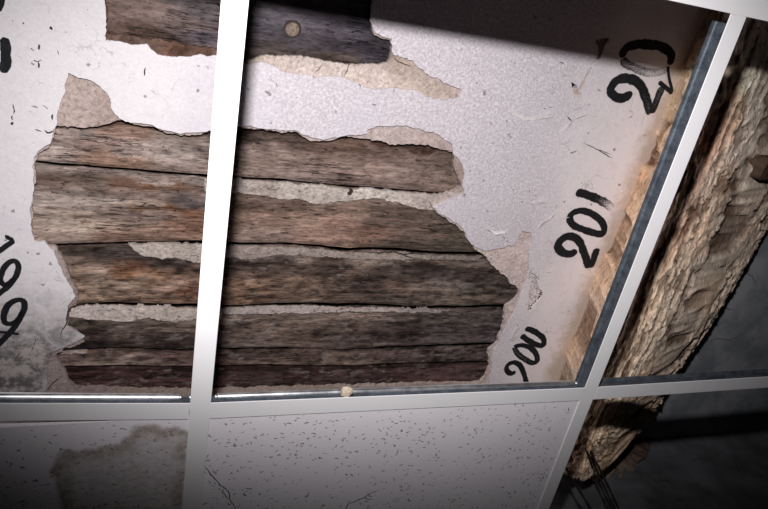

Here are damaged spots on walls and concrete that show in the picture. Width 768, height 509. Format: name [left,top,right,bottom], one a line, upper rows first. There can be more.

flaking render [105,32,217,57]
flaking render [243,26,461,99]
flaking render [30,73,209,233]
flaking render [128,241,202,263]
flaking render [212,125,555,396]
flaking render [47,244,197,397]
leakage [52,426,188,509]
flaking render [578,438,653,485]